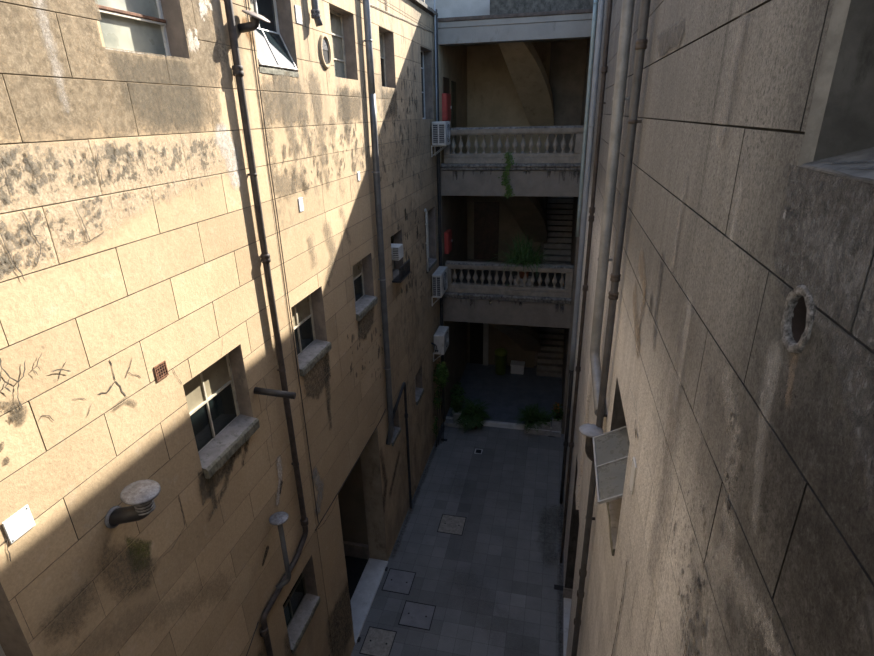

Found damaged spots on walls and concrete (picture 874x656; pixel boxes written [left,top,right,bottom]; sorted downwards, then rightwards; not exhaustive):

damp [262,71,365,198]
crack [0,166,41,280]
crack [64,205,103,245]
damp [0,401,27,424]
crack [0,353,71,408]
crack [77,359,141,416]
damp [304,352,331,424]
damp [198,439,249,519]